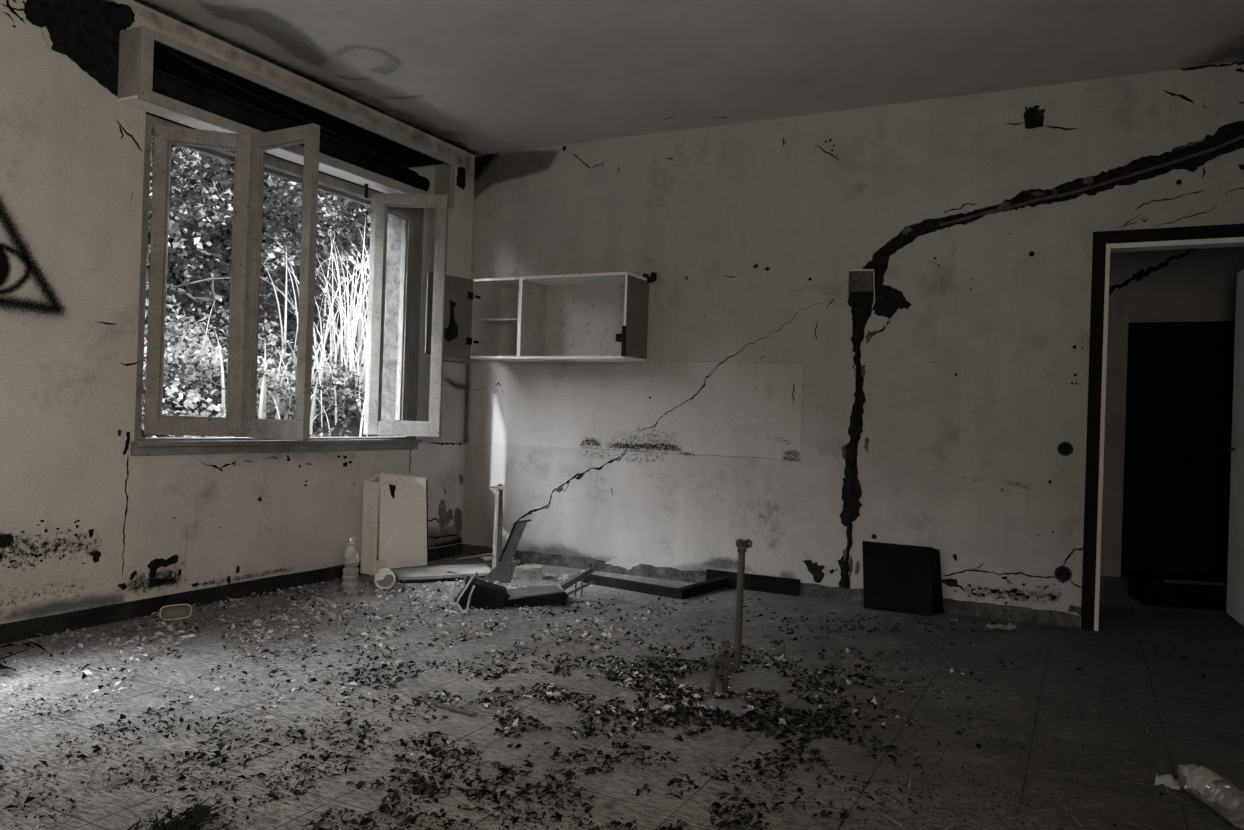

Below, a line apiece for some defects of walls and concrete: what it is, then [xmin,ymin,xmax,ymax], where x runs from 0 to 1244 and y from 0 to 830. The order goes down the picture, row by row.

spalling [23,0,135,97]
crack [1109,167,1244,295]
crack [512,298,835,525]
crack [944,548,1083,587]